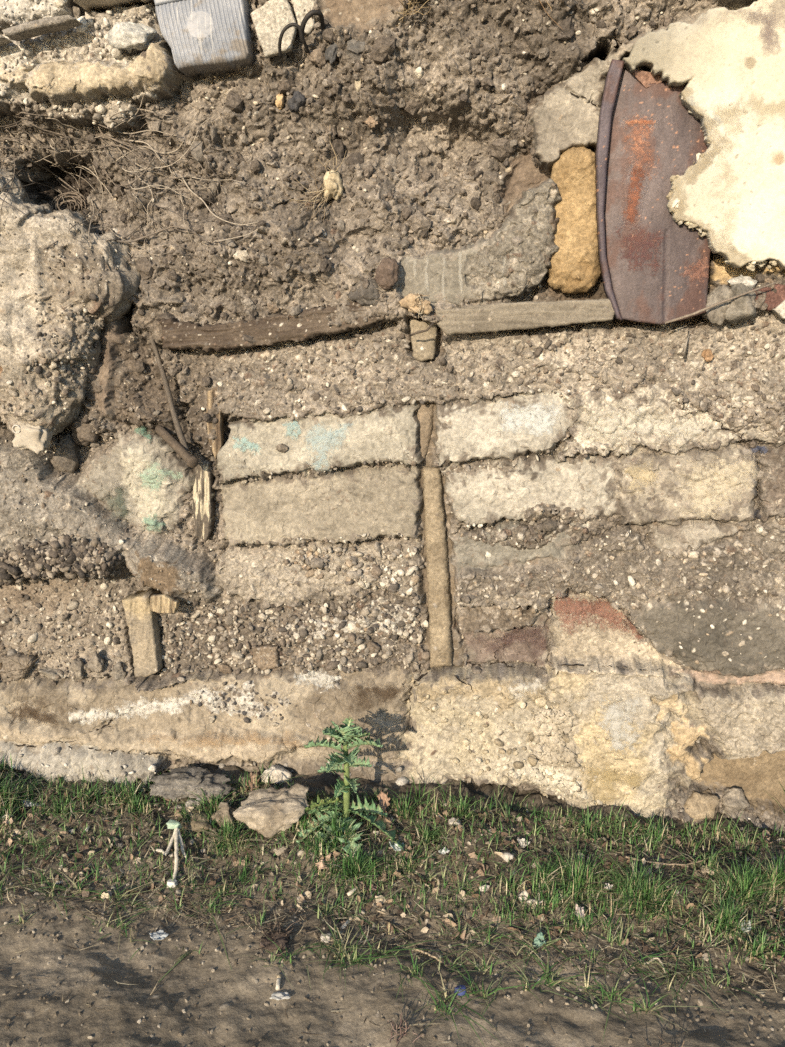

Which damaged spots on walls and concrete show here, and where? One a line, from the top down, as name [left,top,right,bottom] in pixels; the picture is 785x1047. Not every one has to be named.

corrosion [595,59,711,325]